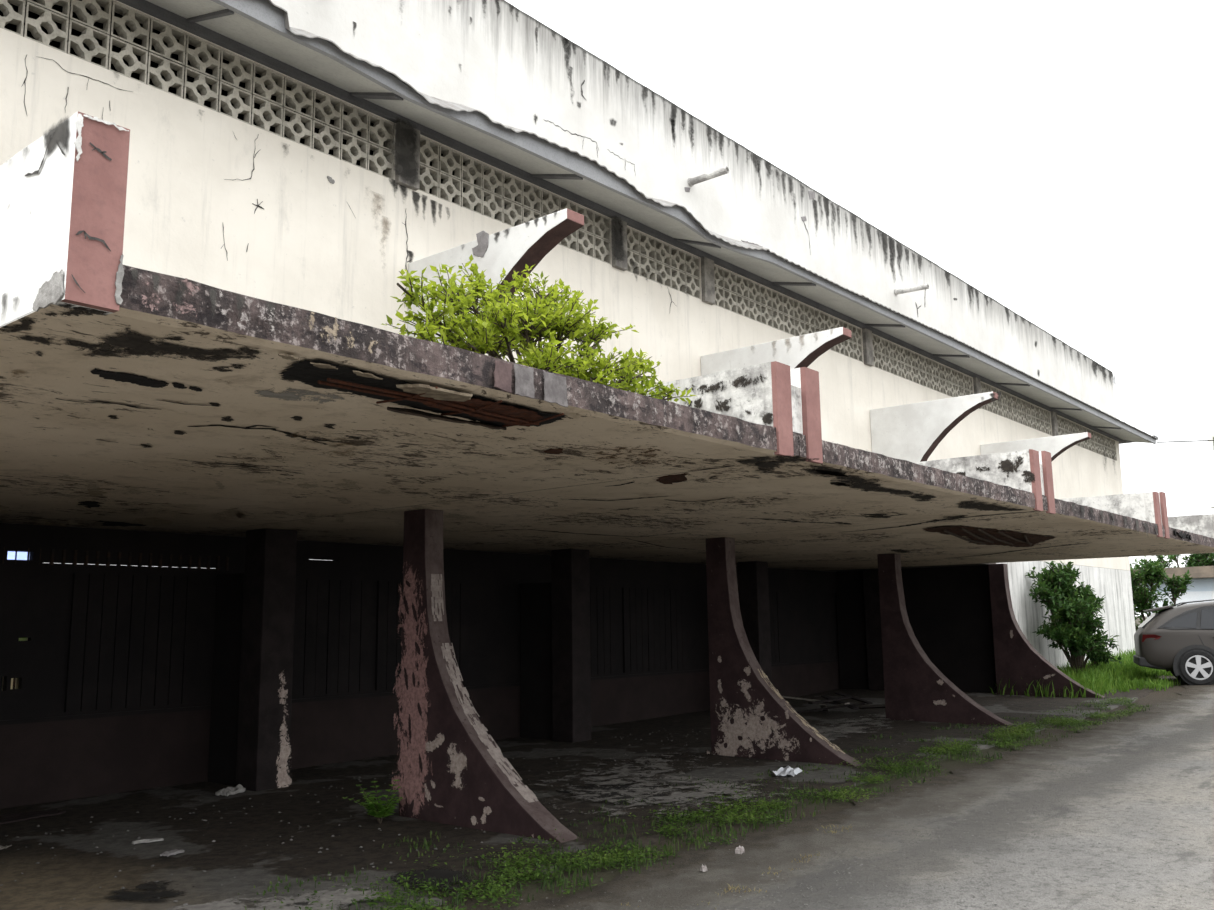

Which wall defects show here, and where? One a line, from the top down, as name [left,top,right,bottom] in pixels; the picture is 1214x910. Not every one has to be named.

damp [535,27,586,81]
damp [44,118,69,155]
crack [21,55,132,176]
crack [225,134,264,213]
damp [642,86,922,274]
crack [76,230,111,251]
spalling [2,269,99,356]
damp [70,328,269,362]
spalling [255,353,568,430]
damp [685,375,773,425]
peeling [391,561,911,818]
peeling [276,672,292,788]